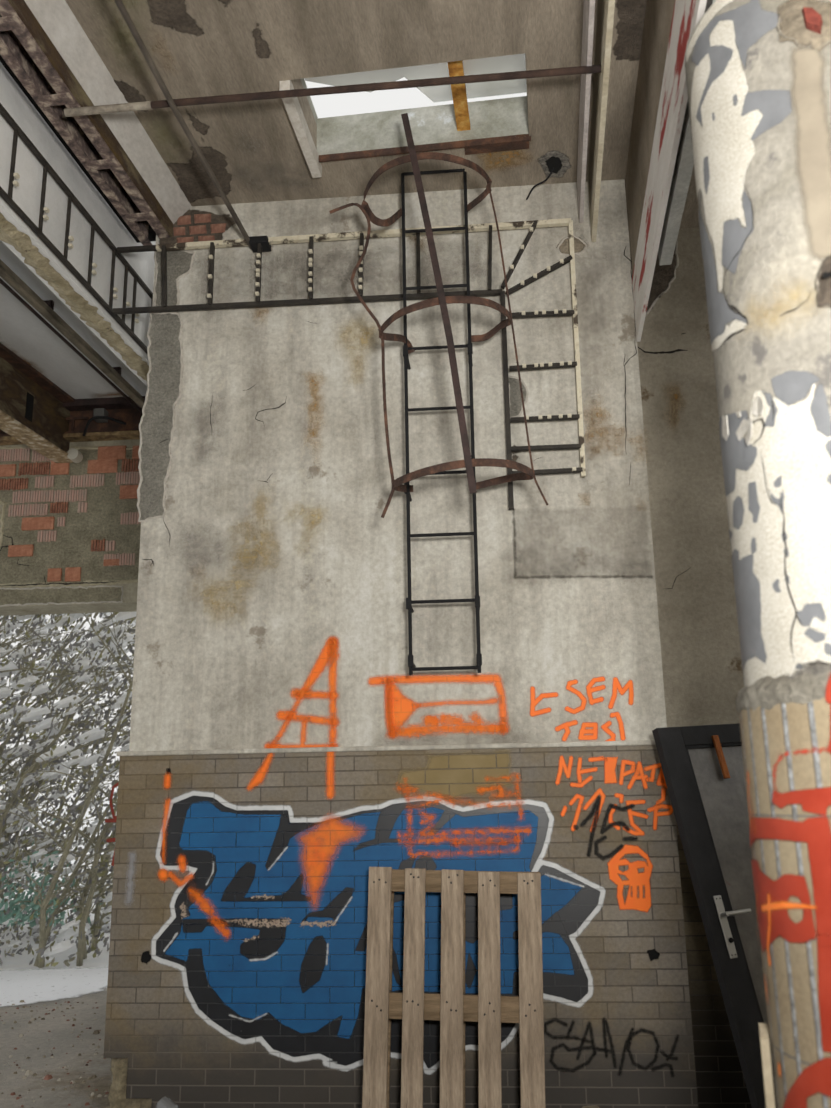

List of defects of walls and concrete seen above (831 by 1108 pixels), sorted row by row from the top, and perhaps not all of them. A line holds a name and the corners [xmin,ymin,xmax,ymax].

spalling [148,0,204,36]
spalling [253,23,270,58]
spalling [691,0,831,309]
spalling [645,237,679,317]
peeling [698,191,754,344]
spalling [0,113,236,607]
peeling [719,371,831,681]